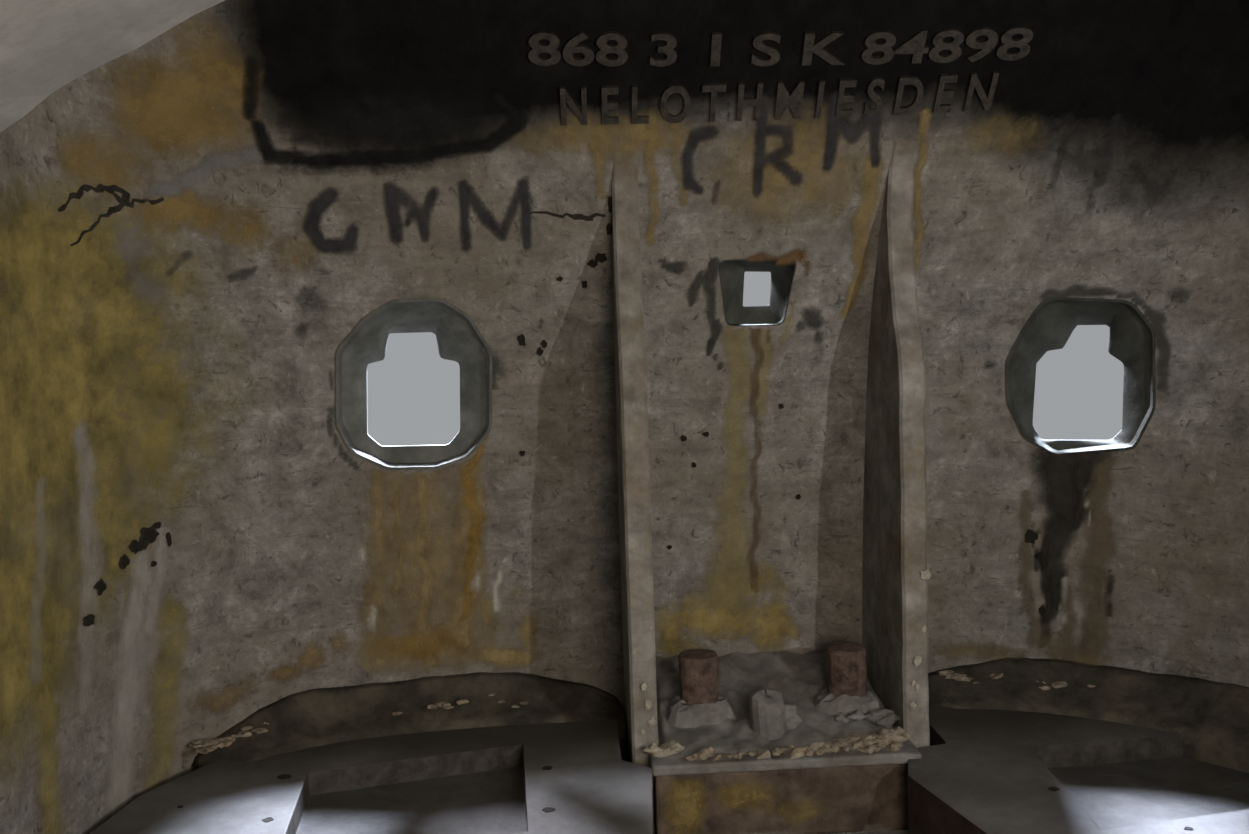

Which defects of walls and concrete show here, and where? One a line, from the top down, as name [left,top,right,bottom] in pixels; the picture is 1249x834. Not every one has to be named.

crack [58,184,164,246]
crack [531,211,605,221]
leakage [659,258,723,370]
leakage [798,309,823,341]
corrosion [750,329,769,468]
corrosion [461,437,494,622]
leakage [1032,448,1109,648]
spalling [641,655,929,761]